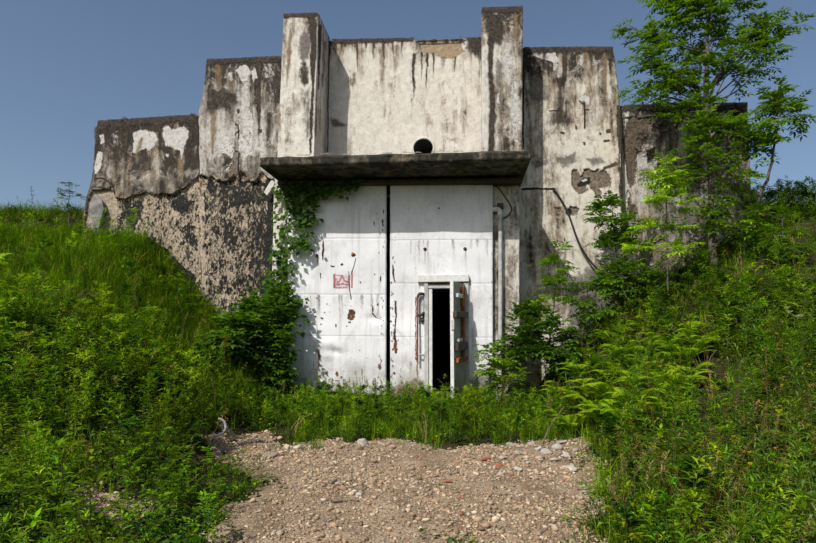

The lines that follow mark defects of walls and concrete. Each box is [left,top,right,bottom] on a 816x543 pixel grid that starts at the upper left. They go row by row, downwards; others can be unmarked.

leakage [206,12,414,153]
leakage [411,51,435,100]
flaking render [417,39,467,59]
leakage [466,6,523,151]
leakage [524,46,613,125]
leakage [94,113,196,172]
spalling [82,64,275,319]
flaking render [571,112,663,218]
leakage [616,102,748,210]
rust [317,241,361,327]
rust [305,256,423,397]